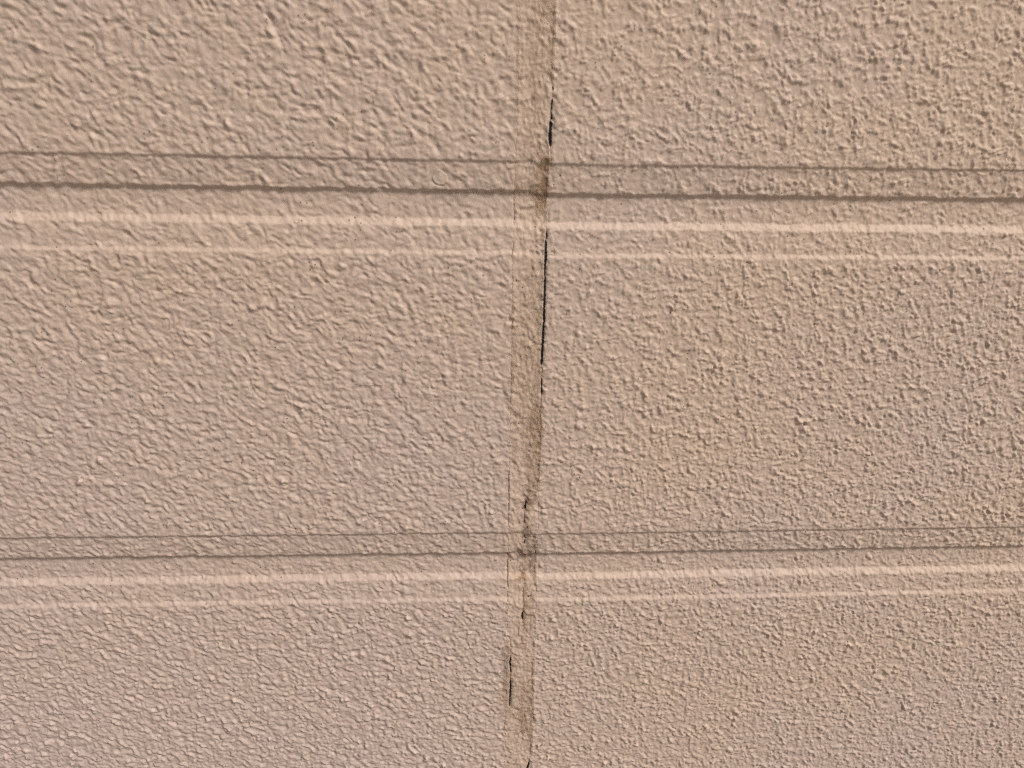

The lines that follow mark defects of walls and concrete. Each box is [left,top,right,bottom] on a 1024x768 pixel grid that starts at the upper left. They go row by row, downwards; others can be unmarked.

crack [546,86,555,161]
crack [540,232,555,446]
crack [504,476,537,732]